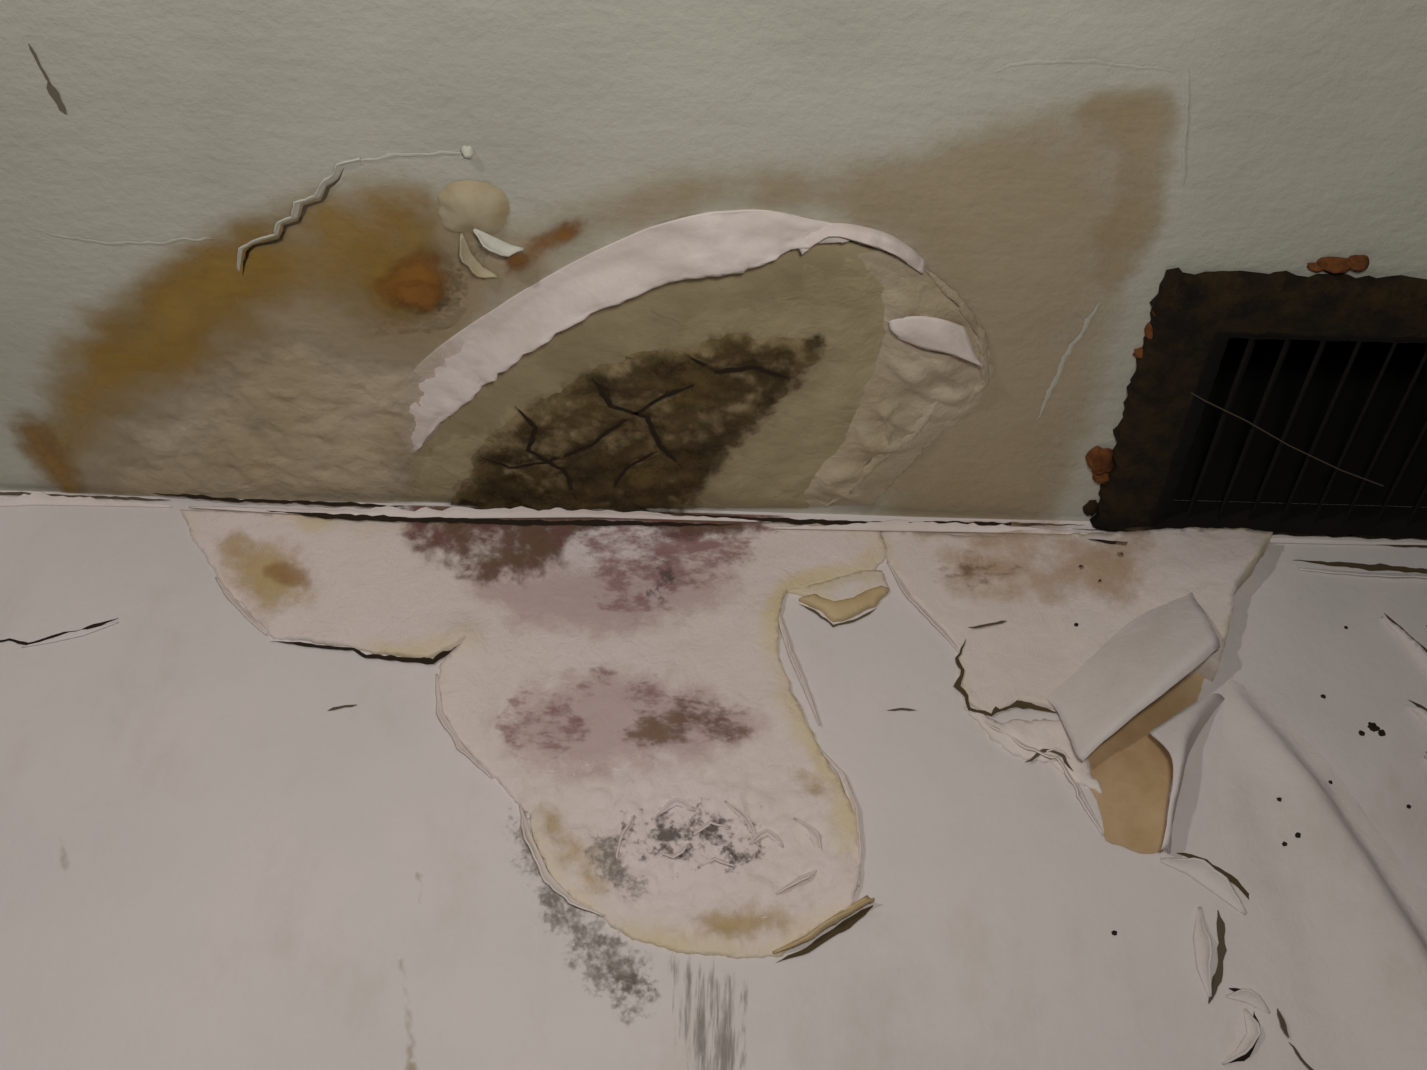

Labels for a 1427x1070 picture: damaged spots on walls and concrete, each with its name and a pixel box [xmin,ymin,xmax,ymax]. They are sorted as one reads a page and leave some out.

corrosion [508,223,579,269]
corrosion [1307,255,1369,273]
leakage [23,208,545,493]
corrosion [1085,445,1115,484]
crack [0,491,1108,535]
corrosion [1083,500,1098,516]
leakage [405,505,780,625]
crack [1269,534,1427,578]
crack [0,618,119,648]
peeling [180,209,1314,1070]
leakage [503,671,747,757]
leakage [641,805,761,867]